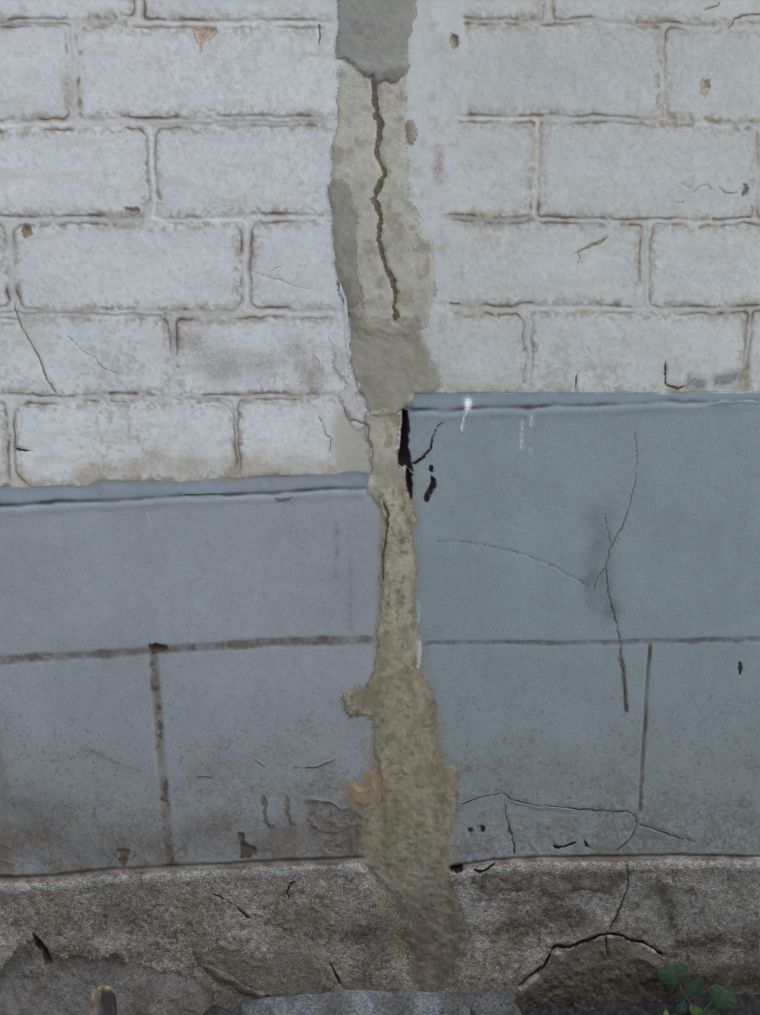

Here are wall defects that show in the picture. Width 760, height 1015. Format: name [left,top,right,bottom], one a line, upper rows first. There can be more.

peeling [449,32,460,50]
crack [370,79,400,321]
crack [14,305,57,394]
flaking render [313,280,368,431]
crack [411,422,442,465]
spalling [424,465,437,502]
crack [574,432,638,710]
crack [213,894,251,919]
crack [463,792,697,985]